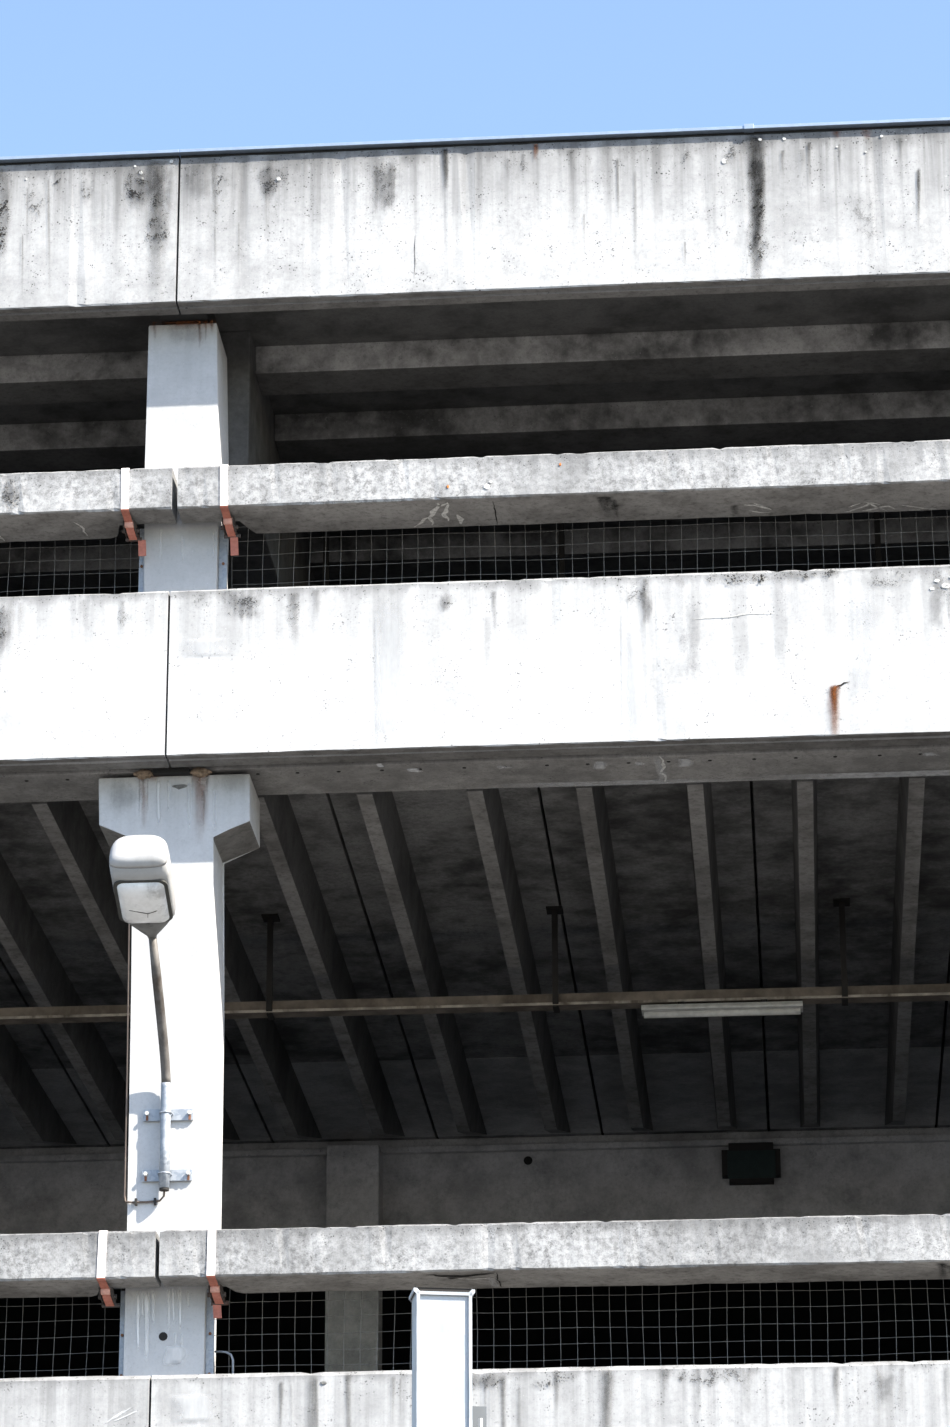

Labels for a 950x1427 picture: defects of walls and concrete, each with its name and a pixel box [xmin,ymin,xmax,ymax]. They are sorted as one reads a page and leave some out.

damp [0,183,9,252]
damp [144,164,168,249]
damp [748,140,769,270]